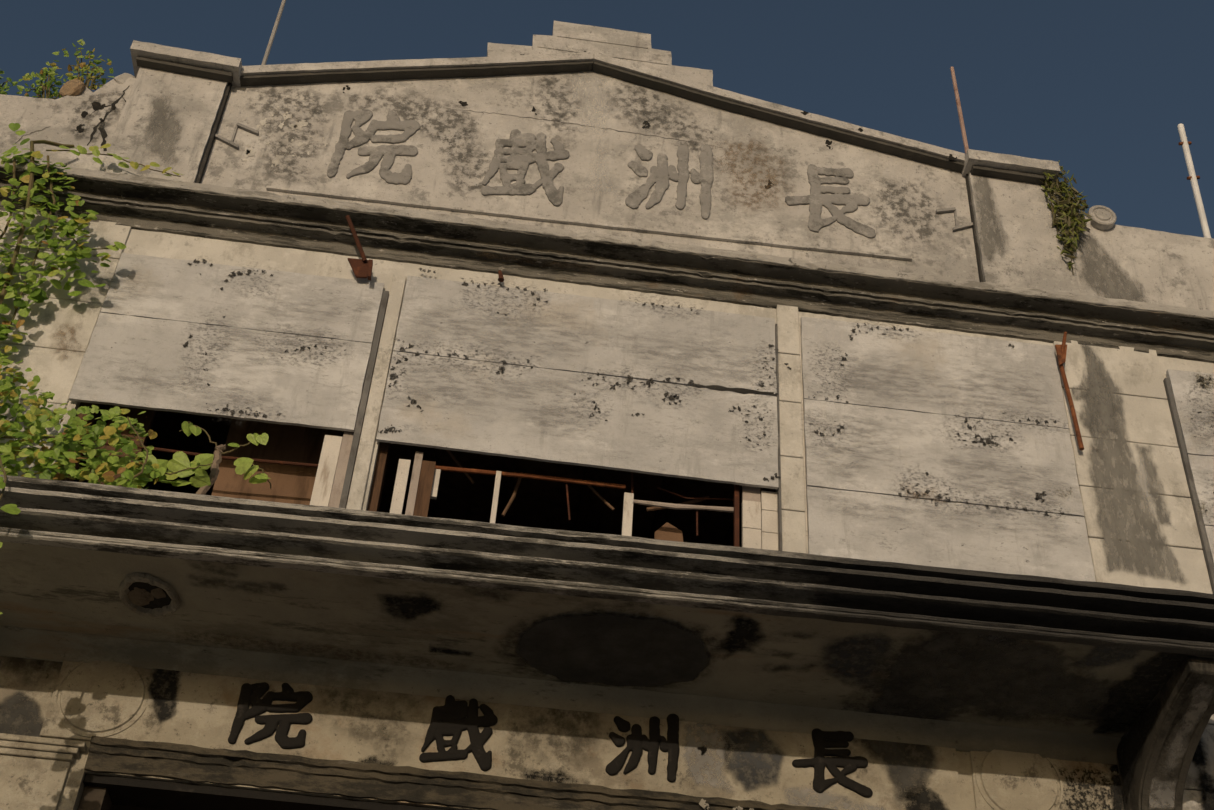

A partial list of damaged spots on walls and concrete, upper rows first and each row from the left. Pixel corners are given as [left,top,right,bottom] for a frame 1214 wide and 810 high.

crack [87,86,129,151]
leakage [148,99,181,161]
leakage [1072,344,1184,582]
spalling [119,573,181,618]
leakage [382,596,440,619]
leakage [721,616,763,653]
leakage [0,692,43,737]
leakage [148,669,180,722]
leakage [824,626,1194,810]
leakage [724,729,783,791]
leakage [1192,739,1214,810]